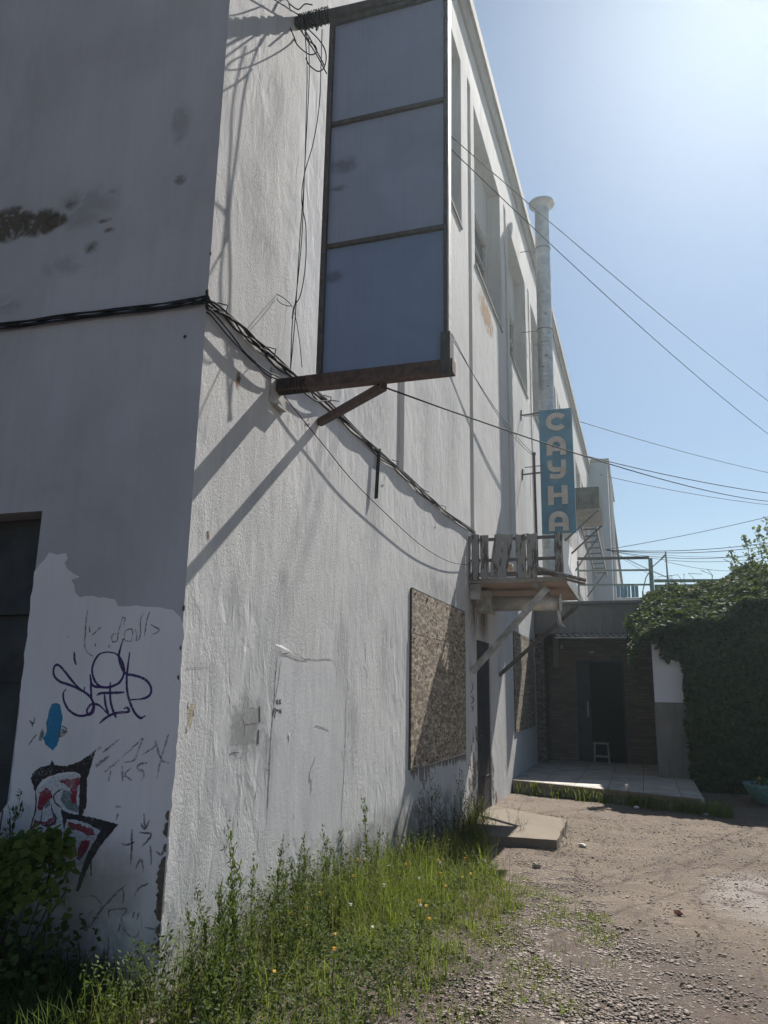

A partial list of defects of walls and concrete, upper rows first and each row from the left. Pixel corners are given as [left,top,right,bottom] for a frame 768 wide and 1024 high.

water stain [0,203,71,242]
spalling [154,811,169,952]